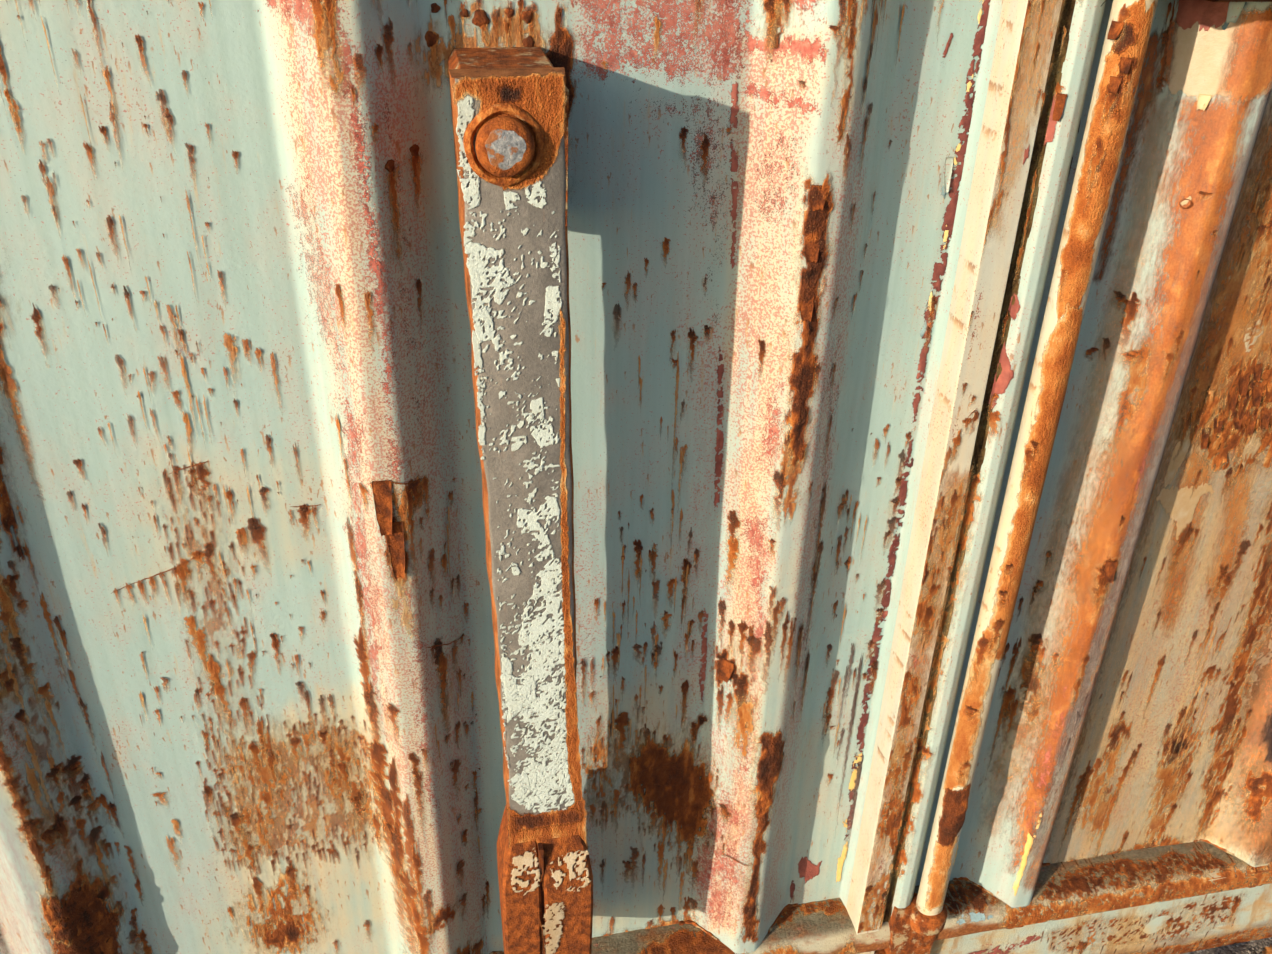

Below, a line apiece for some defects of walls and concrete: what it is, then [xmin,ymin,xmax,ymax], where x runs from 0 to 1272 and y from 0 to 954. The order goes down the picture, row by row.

corrosion [408,0,575,190]
peeling [570,0,829,281]
corrosion [763,0,790,61]
corrosion [829,0,886,171]
peeling [1164,0,1272,111]
corrosion [111,276,483,954]
peeling [456,95,592,820]
corrosion [507,173,867,954]
peeling [714,347,724,511]
peeling [836,0,991,883]
corrosion [925,0,1272,954]
peeling [790,857,822,903]